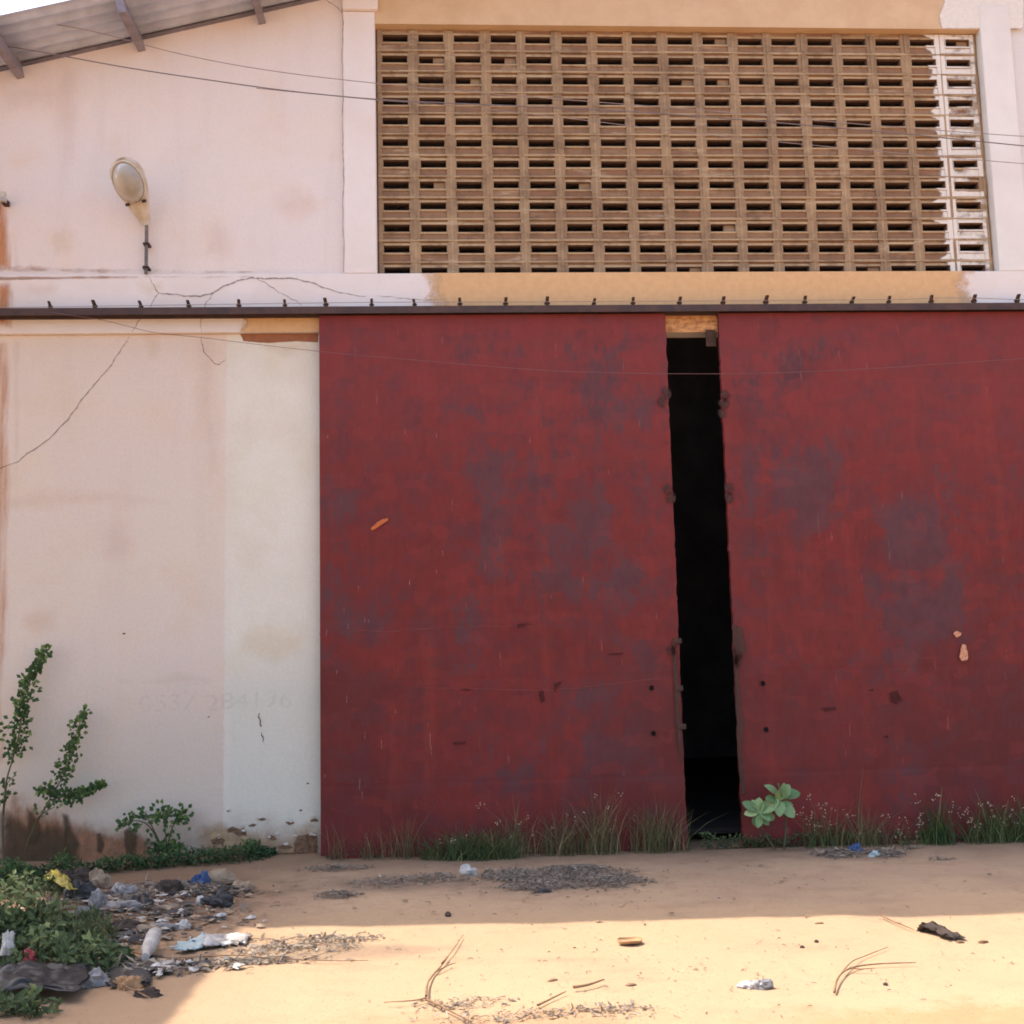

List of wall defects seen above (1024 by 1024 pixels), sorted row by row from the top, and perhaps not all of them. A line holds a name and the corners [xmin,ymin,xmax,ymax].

corrosion [0,286,8,307]
peeling [953,631,968,661]
corrosion [732,625,745,795]
water stain [1,812,79,862]
peeling [211,818,266,856]
water stain [200,830,296,856]
peeling [265,809,318,855]